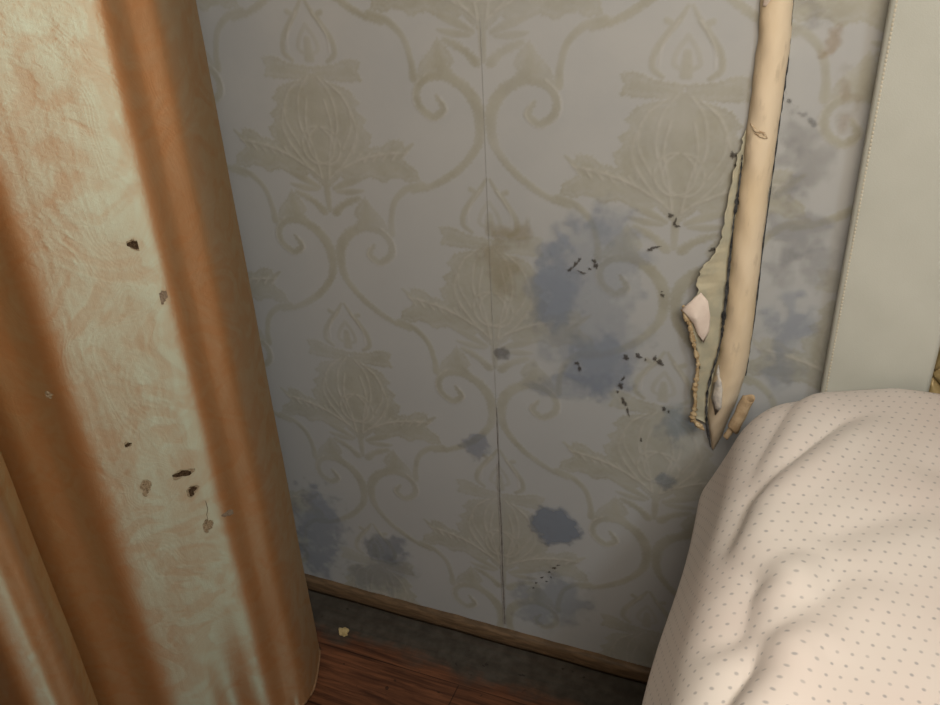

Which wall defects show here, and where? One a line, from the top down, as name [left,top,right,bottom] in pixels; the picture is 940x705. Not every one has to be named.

peeling [682,293,710,343]
damp [532,508,580,545]